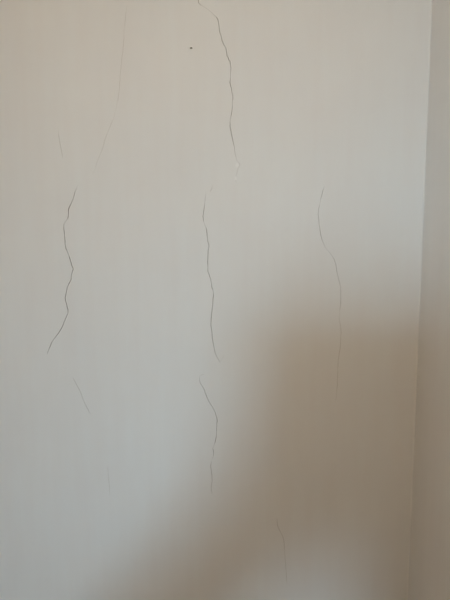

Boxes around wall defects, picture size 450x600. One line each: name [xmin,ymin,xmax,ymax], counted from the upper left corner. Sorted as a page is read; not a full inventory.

crack [197,0,240,180]
crack [47,185,78,354]
crack [202,189,220,362]